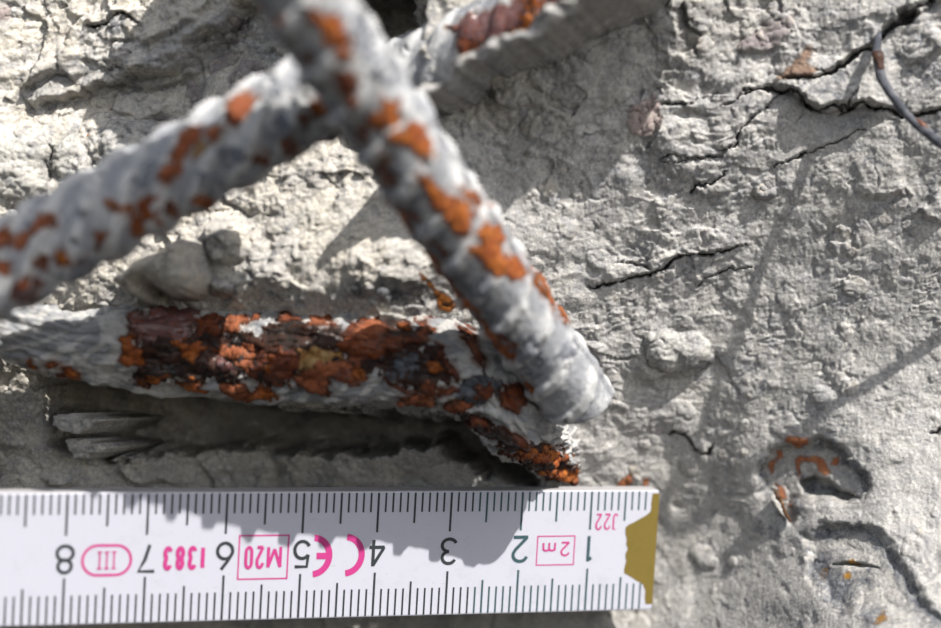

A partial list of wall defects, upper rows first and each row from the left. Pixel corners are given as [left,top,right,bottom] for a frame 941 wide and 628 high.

spalling [483,0,795,164]
crack [660,0,941,194]
spalling [0,0,615,486]
rust [419,272,456,312]
crack [589,246,750,289]
rust [768,436,839,522]